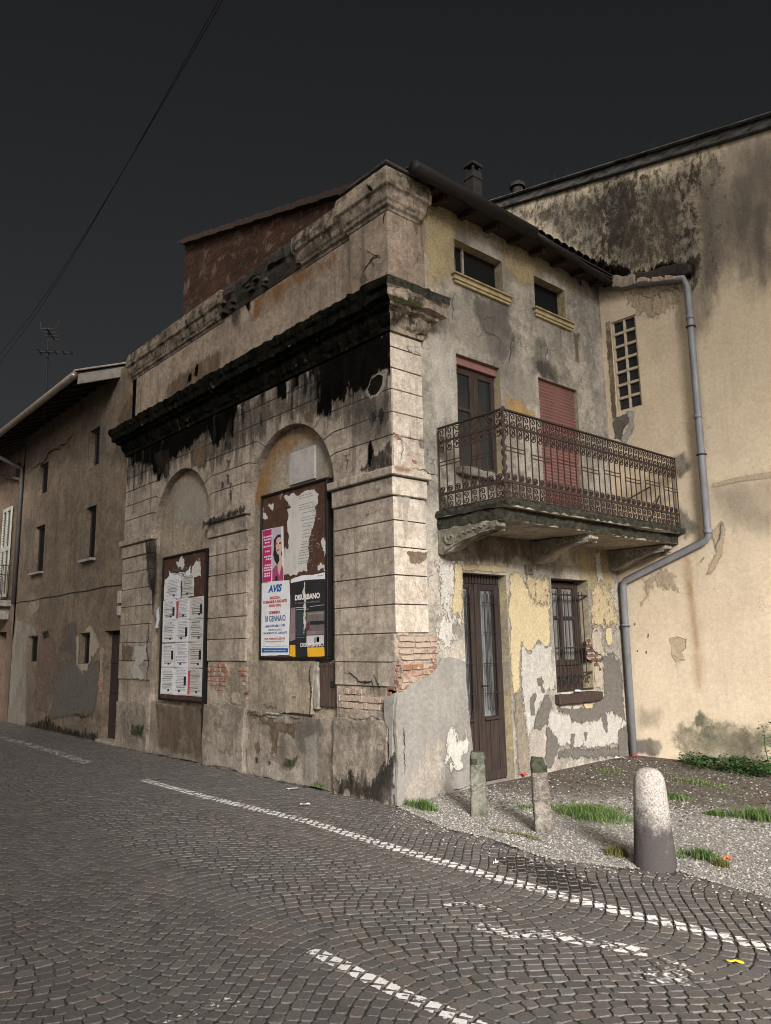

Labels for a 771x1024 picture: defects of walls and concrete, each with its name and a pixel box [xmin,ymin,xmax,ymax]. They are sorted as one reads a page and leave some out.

leakage [512,139,771,291]
leakage [171,351,221,396]
leakage [260,310,417,426]
leakage [129,401,246,530]
leakage [361,441,392,472]
peeling [706,521,726,575]
flaking render [208,663,248,694]
peeling [338,547,658,777]
leakage [675,712,771,763]
leakage [337,740,446,806]